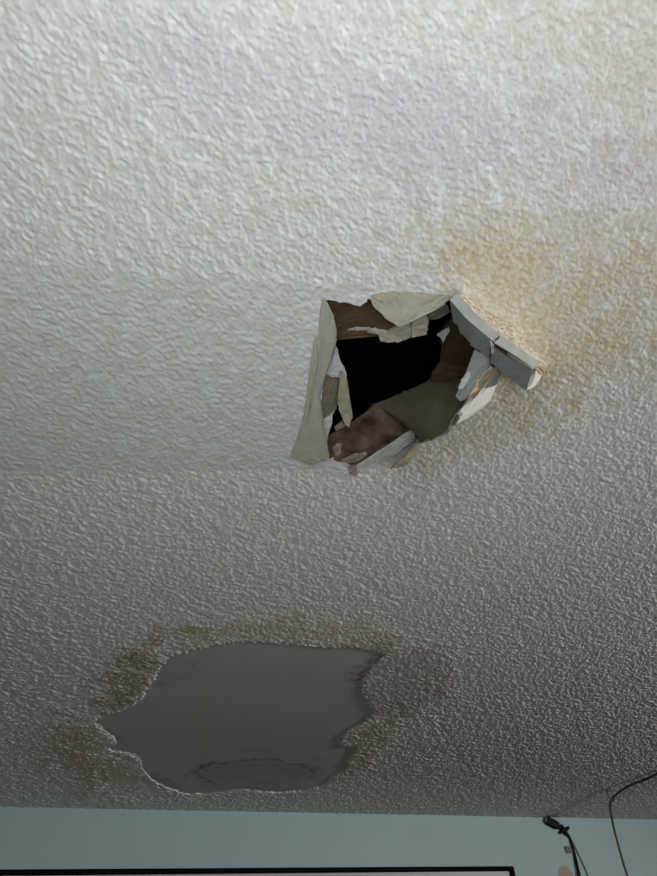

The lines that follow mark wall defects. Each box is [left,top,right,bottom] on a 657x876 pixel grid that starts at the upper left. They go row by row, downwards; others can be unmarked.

damp [0,598,477,802]